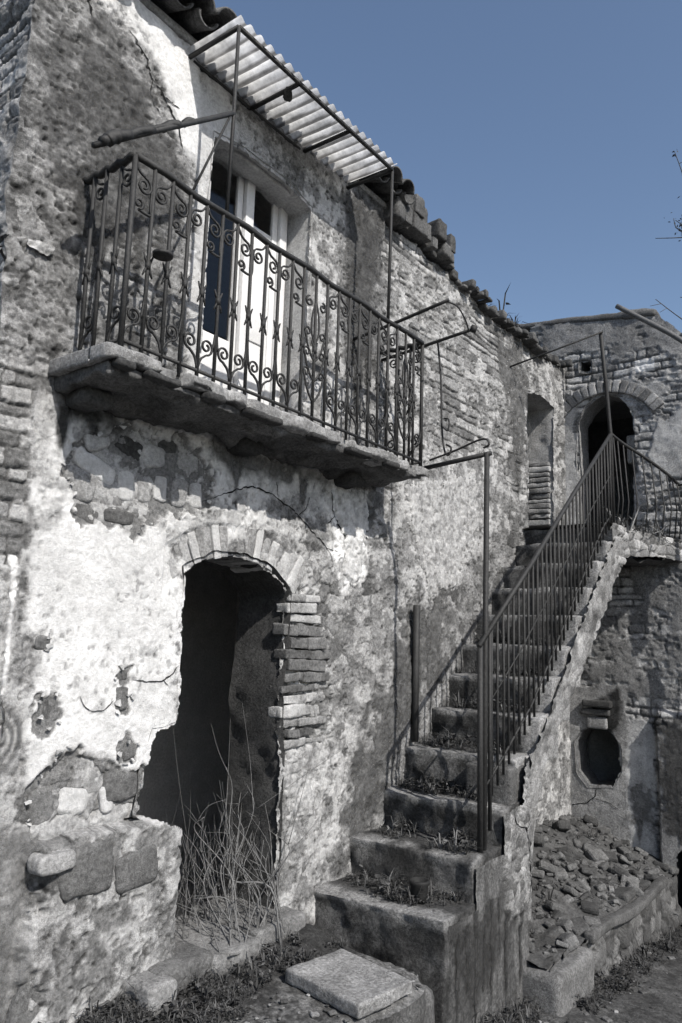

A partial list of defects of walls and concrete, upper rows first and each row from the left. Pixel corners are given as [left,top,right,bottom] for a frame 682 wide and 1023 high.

flaking render [61,423,215,531]
crack [202,482,346,562]
flaking render [38,691,62,731]
flaking render [24,738,158,901]
damp [626,715,682,845]